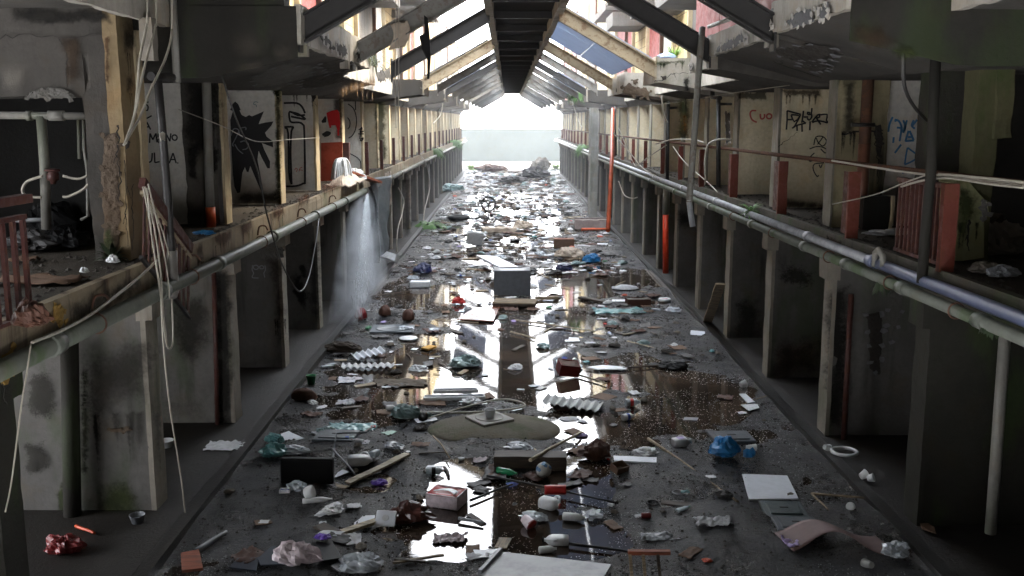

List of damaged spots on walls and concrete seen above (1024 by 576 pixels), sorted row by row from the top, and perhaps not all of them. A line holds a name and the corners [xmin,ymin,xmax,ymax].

peeling [769,1,831,31]
damp [841,82,856,152]
spalling [98,132,130,255]
damp [22,373,56,419]
damp [24,444,47,472]